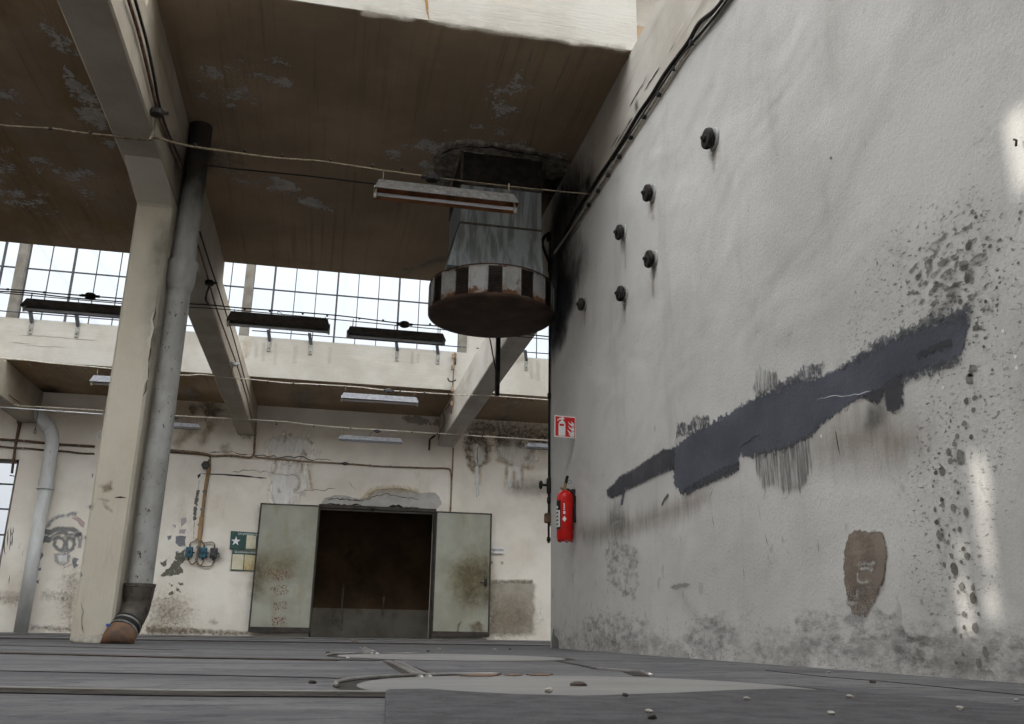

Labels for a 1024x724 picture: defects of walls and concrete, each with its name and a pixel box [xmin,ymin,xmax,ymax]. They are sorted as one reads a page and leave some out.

spalling [417,138,571,187]
leakage [464,402,548,496]
leakage [840,186,1024,638]
peeling [160,486,200,600]
leakage [489,580,534,634]
peeling [843,529,887,617]